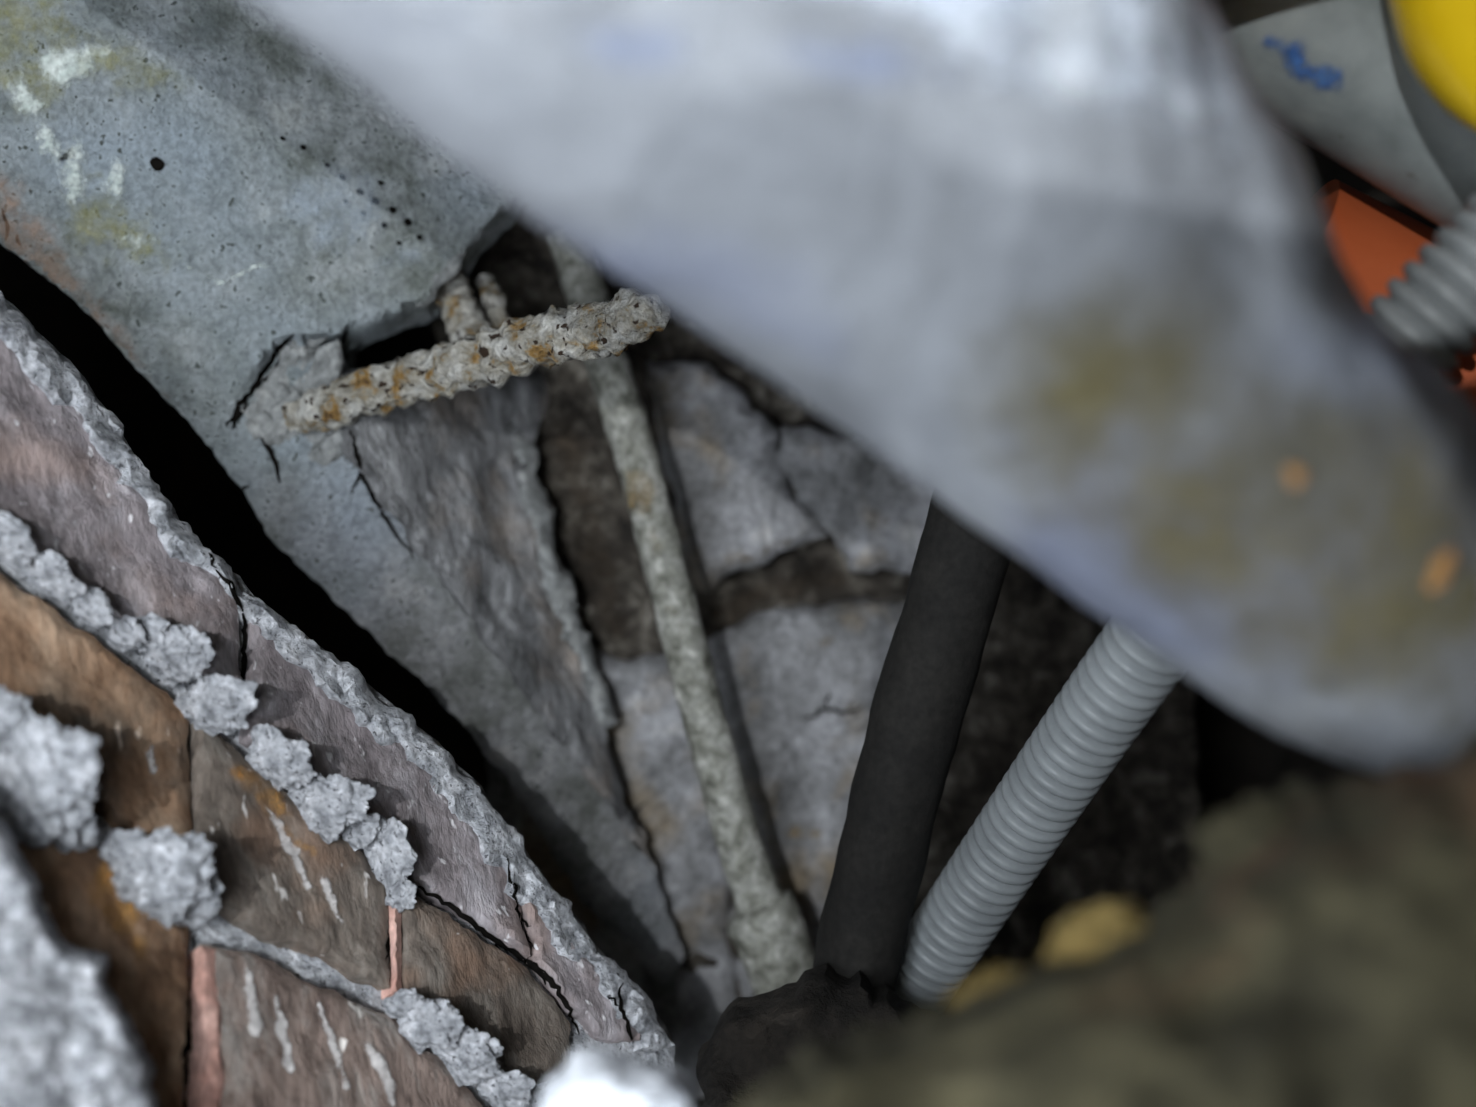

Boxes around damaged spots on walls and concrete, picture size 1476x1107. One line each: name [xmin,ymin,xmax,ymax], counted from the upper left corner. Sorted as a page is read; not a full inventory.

crack [225,331,348,490]
spalling [241,251,670,466]